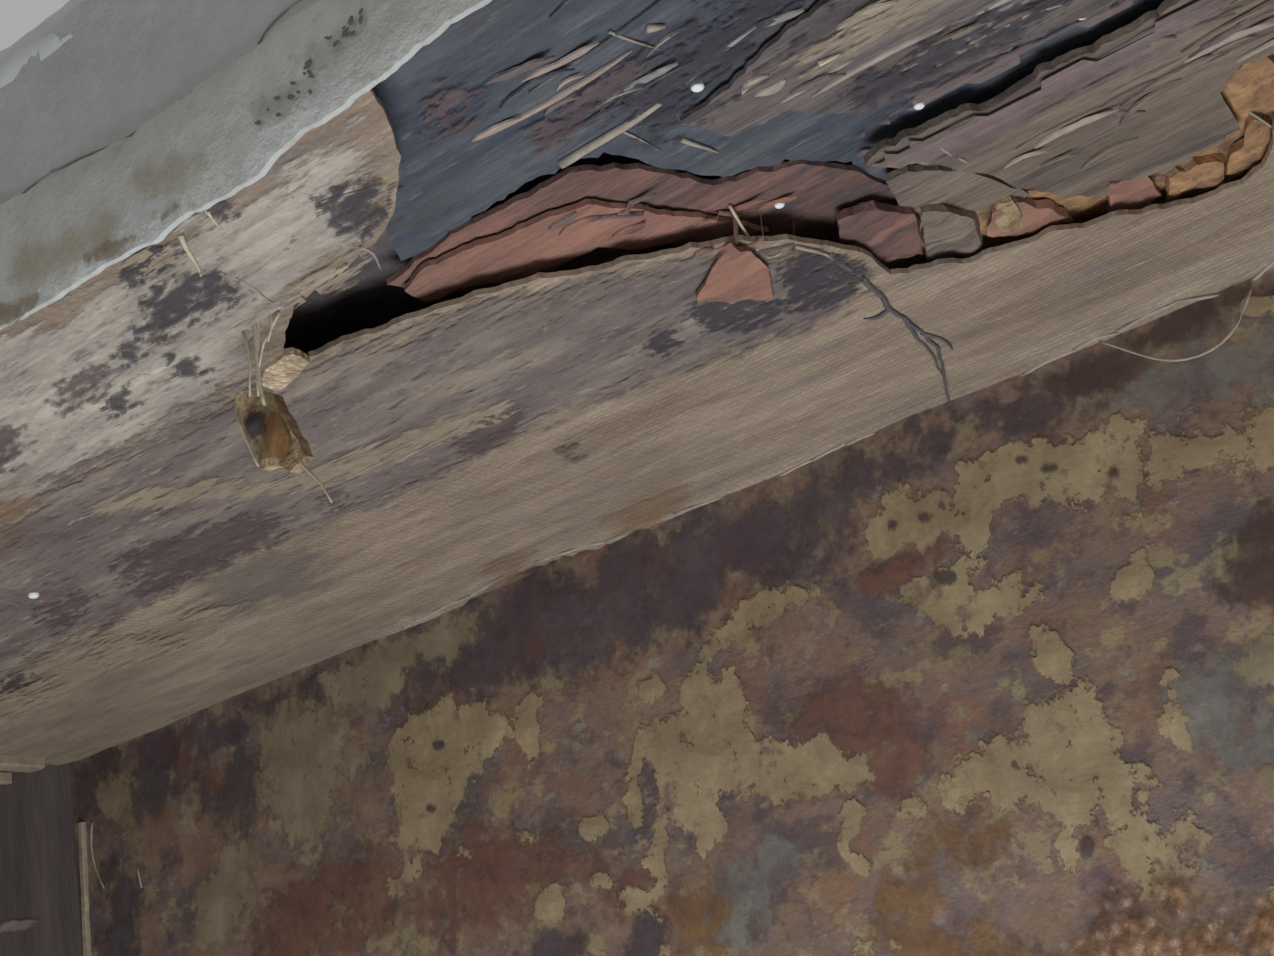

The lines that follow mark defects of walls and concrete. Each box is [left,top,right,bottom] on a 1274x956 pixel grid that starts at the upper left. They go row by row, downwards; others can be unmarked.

water stain [254,59,315,125]
water stain [420,80,486,143]
water stain [207,197,241,227]
water stain [287,177,402,309]
crack [828,252,953,404]
water stain [0,242,880,723]
peeling [860,405,1274,903]
peeling [253,606,543,900]
peeling [589,579,878,923]
corrosion [786,668,930,800]
peeling [578,812,610,843]
peeling [534,879,566,925]